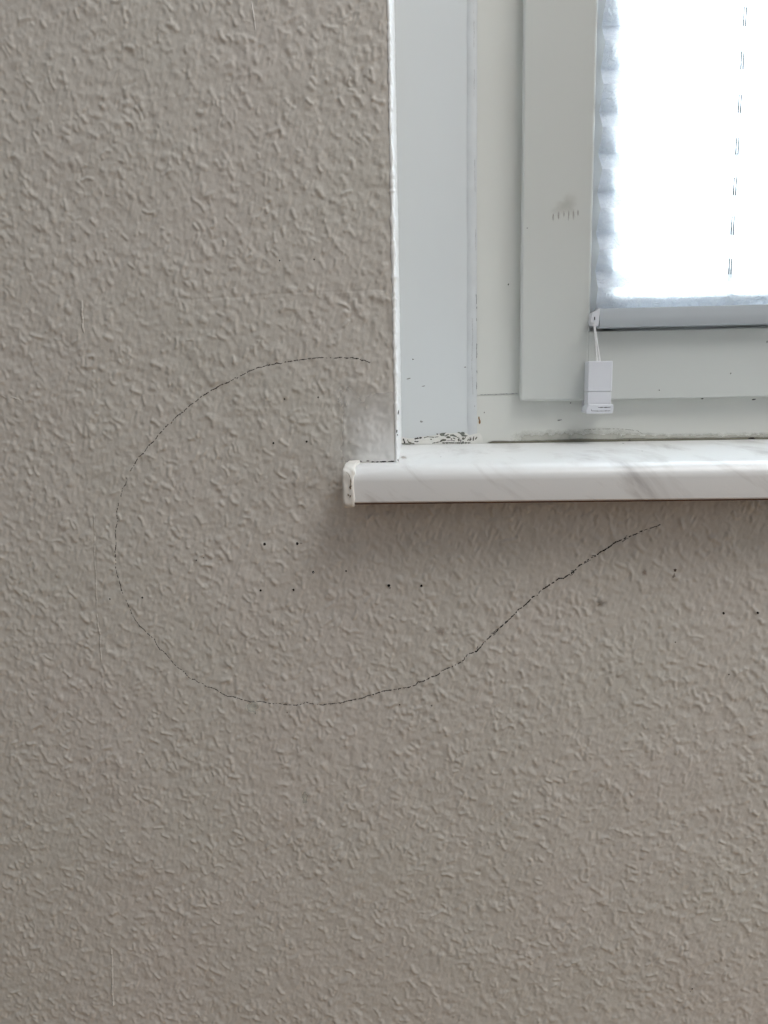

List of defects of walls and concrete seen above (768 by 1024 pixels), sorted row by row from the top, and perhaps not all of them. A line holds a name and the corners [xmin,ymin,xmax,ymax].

crack [115,357,660,706]